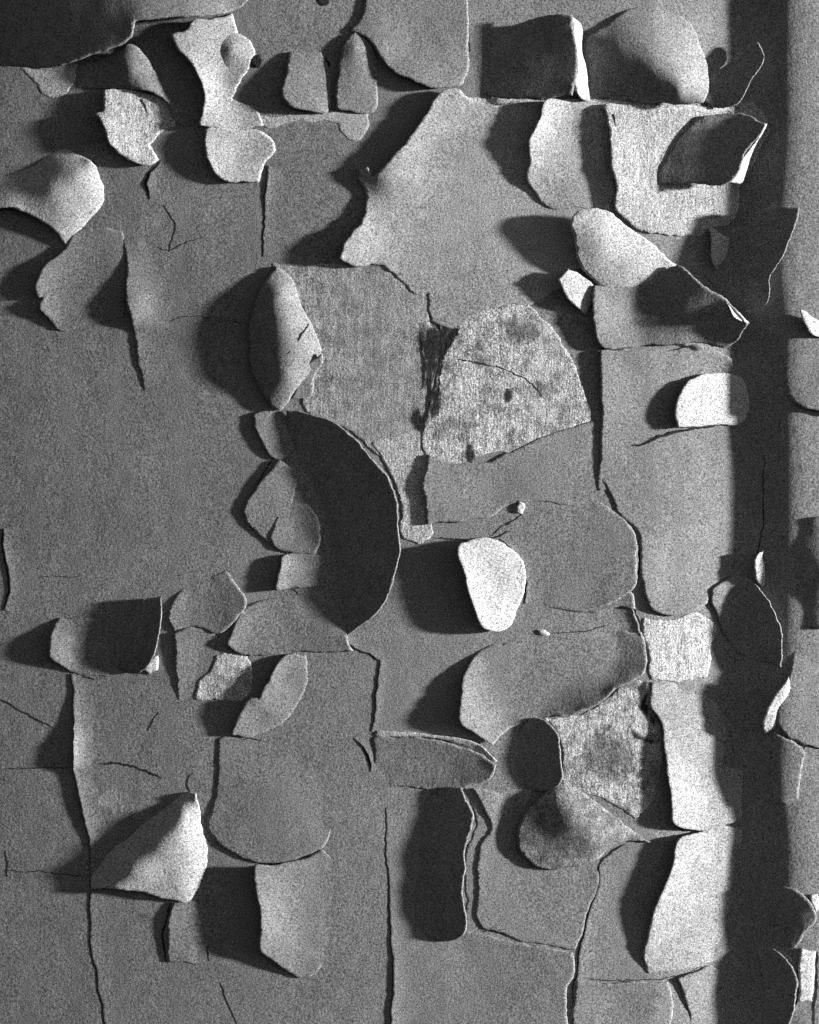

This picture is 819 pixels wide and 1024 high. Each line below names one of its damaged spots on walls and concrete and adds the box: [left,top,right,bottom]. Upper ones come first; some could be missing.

peeling [0,149,172,391]
crack [262,165,284,257]
peeling [167,6,800,978]
crack [0,673,161,1024]
peeling [91,792,208,965]
crack [385,807,412,1024]
peeling [372,730,674,1024]